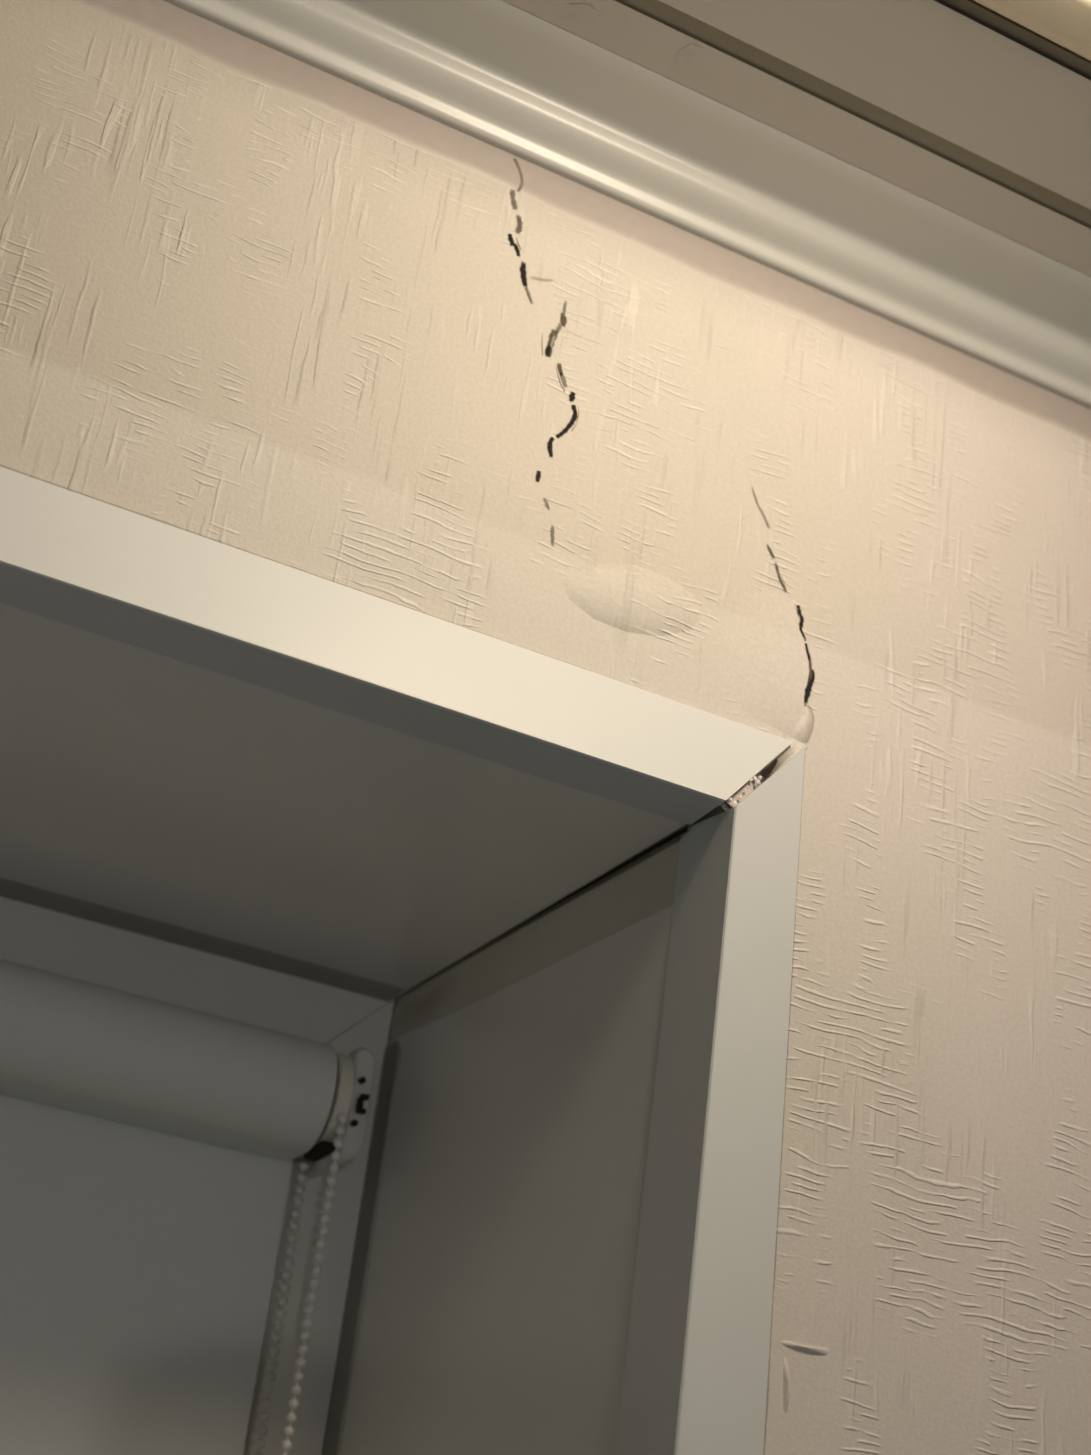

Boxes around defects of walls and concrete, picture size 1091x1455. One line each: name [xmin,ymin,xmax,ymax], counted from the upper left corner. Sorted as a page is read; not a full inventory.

crack [508,158,580,545]
crack [753,491,815,703]